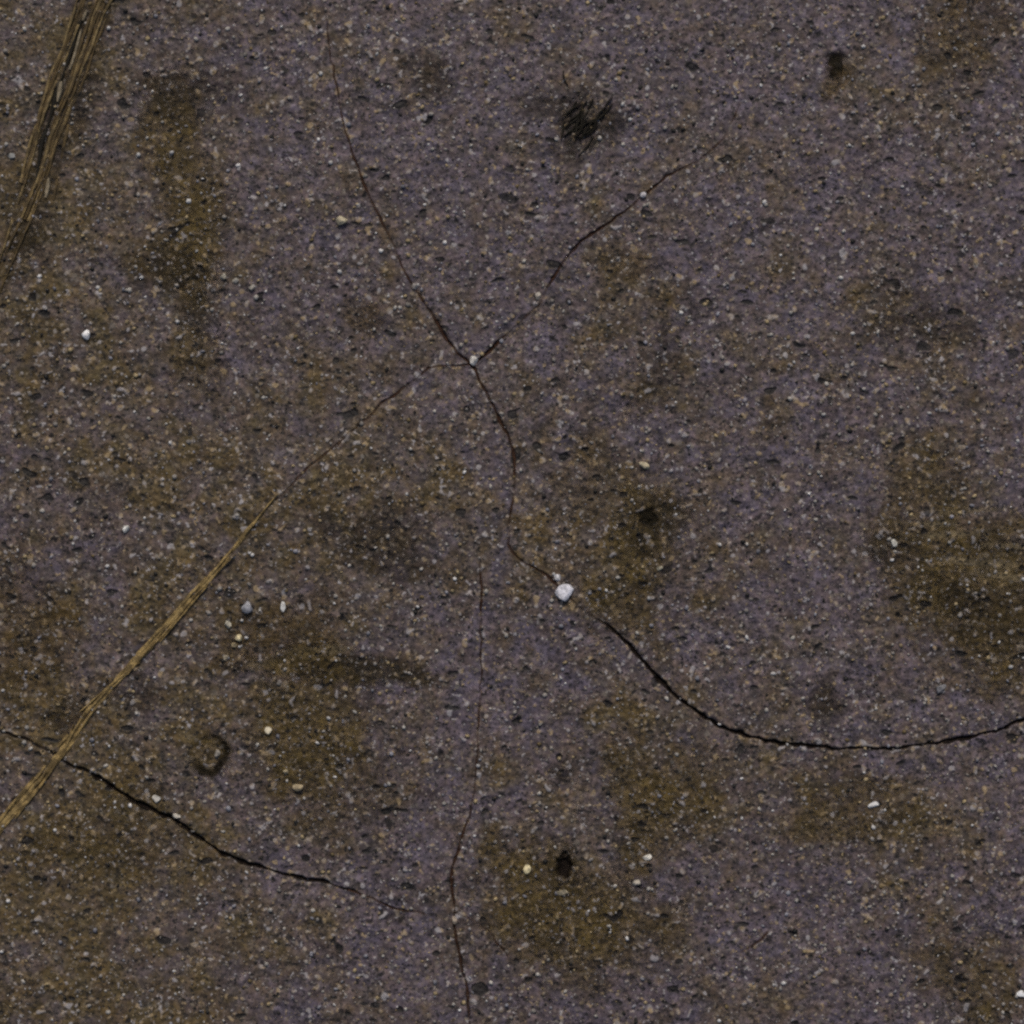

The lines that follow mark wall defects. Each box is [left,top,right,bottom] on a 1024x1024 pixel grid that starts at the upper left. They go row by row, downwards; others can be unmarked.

crack [276,435,346,500]
crack [326,19,1024,751]
crack [0,731,424,914]